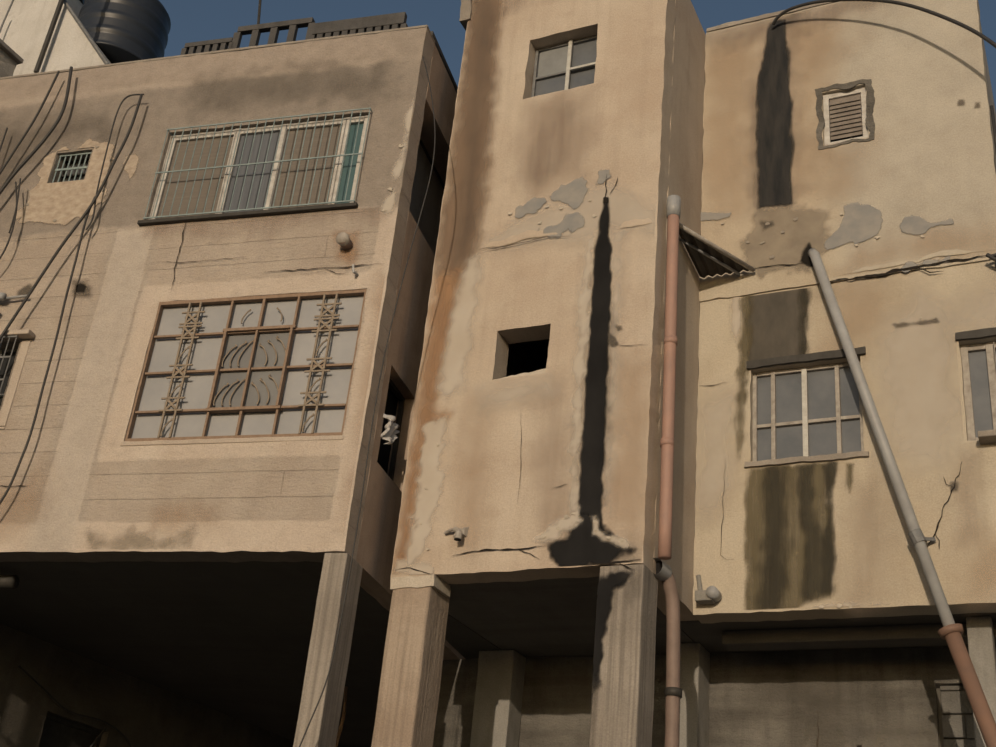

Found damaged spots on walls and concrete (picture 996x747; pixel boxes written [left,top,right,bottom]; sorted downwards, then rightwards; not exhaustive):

water stain [756,20,794,208]
flaking render [16,138,139,226]
crack [167,223,237,289]
crack [267,264,373,274]
water stain [436,0,502,394]
peeling [508,170,611,239]
peeling [900,216,954,238]
water stain [732,288,809,445]
water stain [548,176,635,689]
crack [453,546,539,559]
water stain [799,461,837,599]
crack [927,461,962,550]